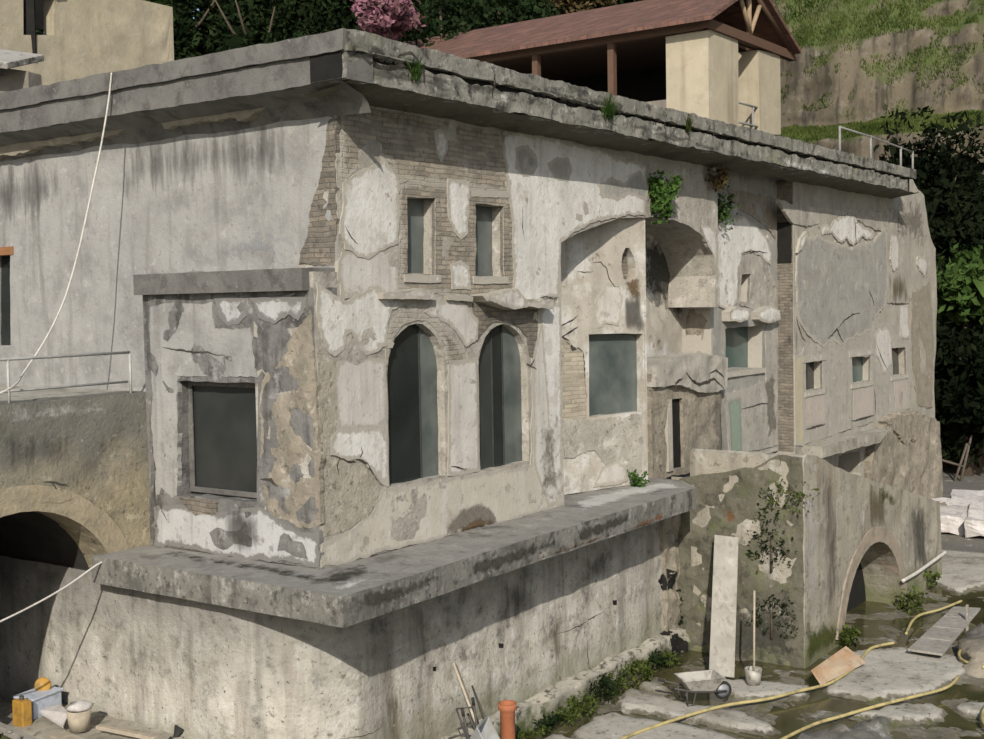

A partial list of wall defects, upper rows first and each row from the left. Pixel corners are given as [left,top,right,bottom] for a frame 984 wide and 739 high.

crack [352,51,426,87]
flaking render [700,188,934,446]
flaking render [150,115,649,567]
crack [331,447,383,486]
damp [580,515,628,540]
damp [215,561,365,590]
damp [364,578,429,606]
damp [475,541,555,574]